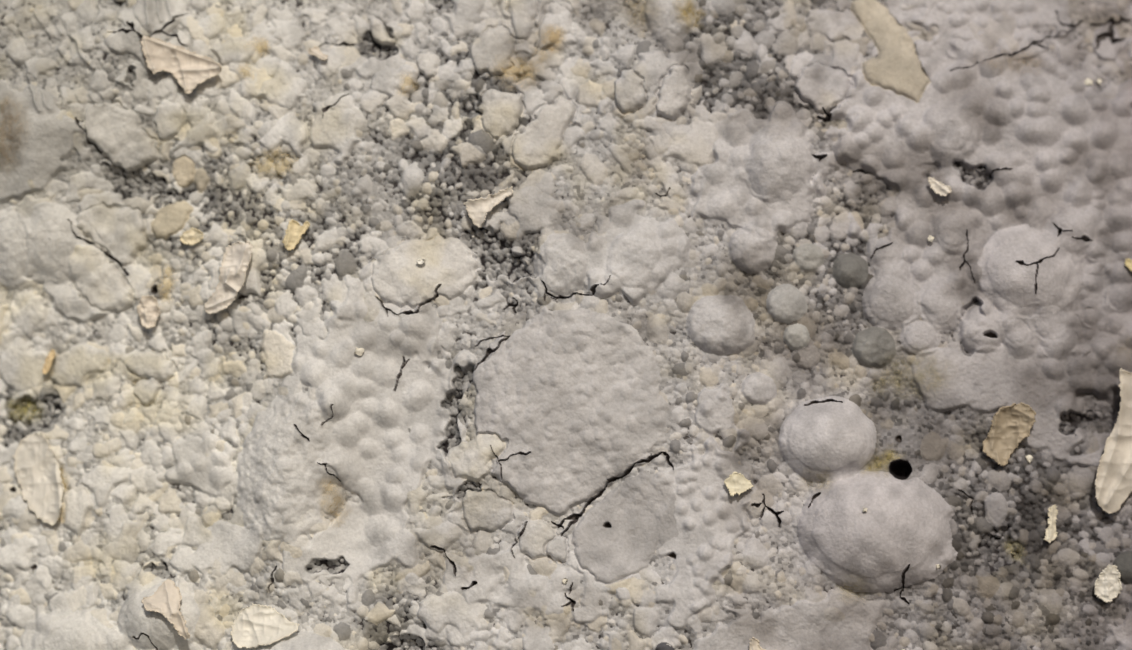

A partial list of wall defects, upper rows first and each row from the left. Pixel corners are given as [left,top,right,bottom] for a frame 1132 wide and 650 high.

peeling [126,36,222,94]
spalling [1059,411,1098,435]
peeling [1095,368,1132,514]
crack [510,451,674,558]